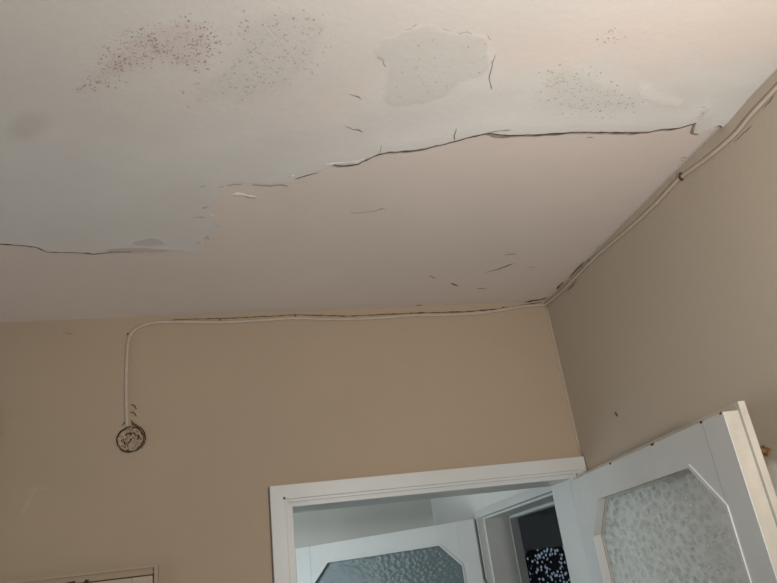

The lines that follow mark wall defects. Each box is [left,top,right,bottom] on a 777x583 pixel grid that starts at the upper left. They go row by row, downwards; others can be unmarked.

water stain [71,0,344,108]
peeling [0,0,777,254]
water stain [373,23,493,108]
water stain [525,54,652,122]